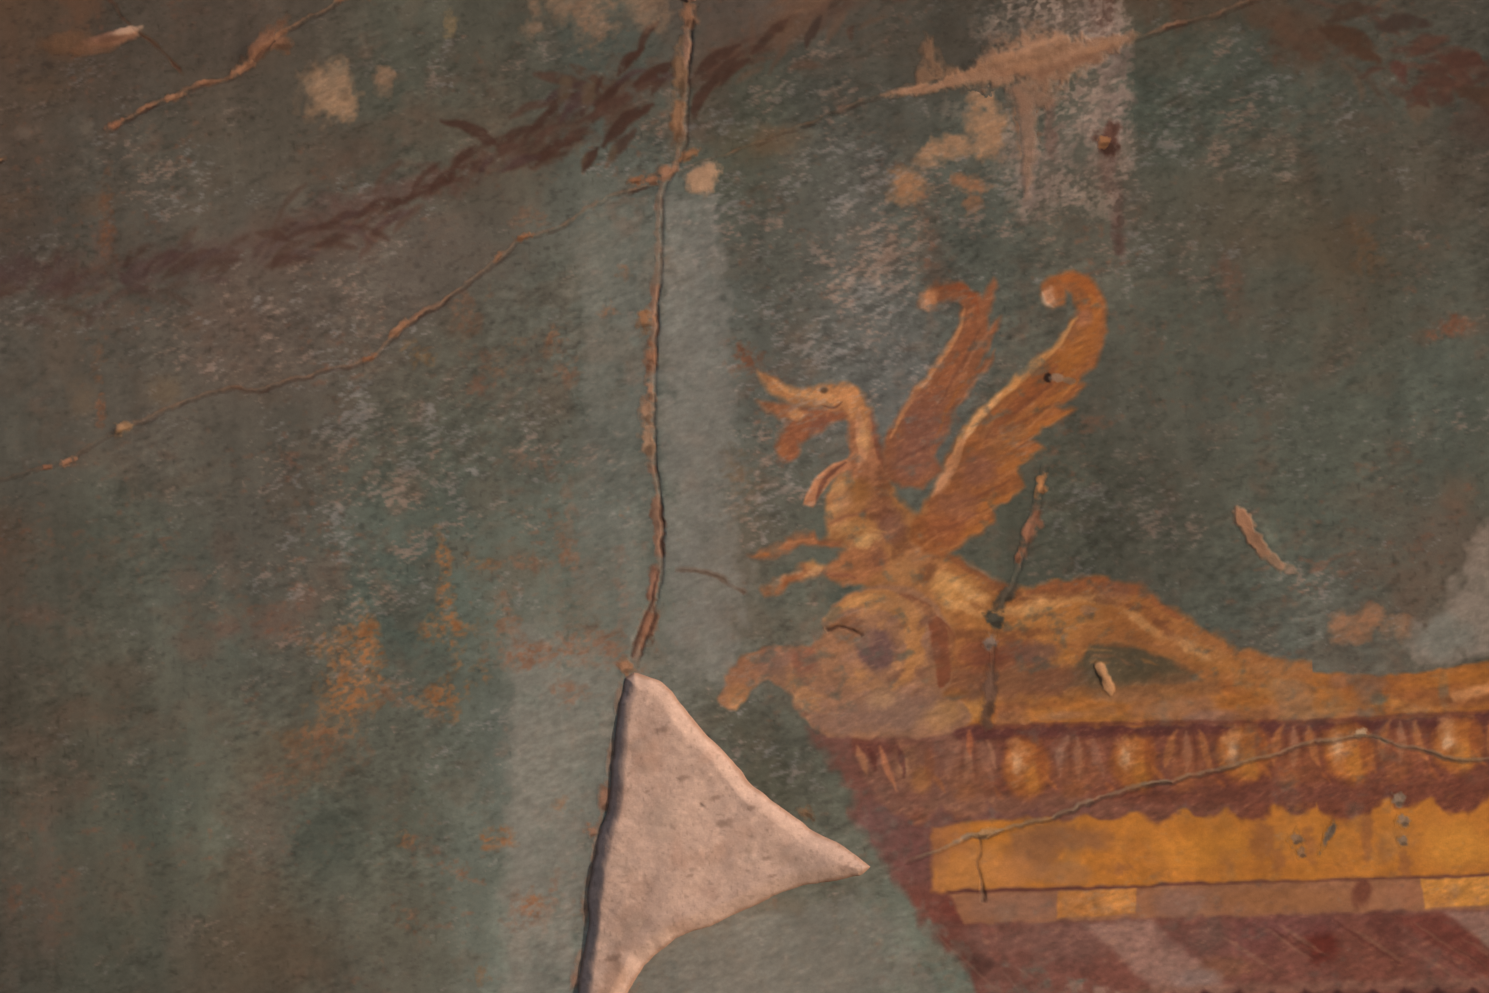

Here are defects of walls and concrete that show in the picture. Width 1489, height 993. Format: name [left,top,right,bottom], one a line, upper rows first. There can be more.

crack [1134,0,1270,43]
peeling [883,85,1015,220]
crack [0,0,914,678]
crack [978,460,1050,733]
peeling [578,737,615,927]
crack [903,726,1489,906]